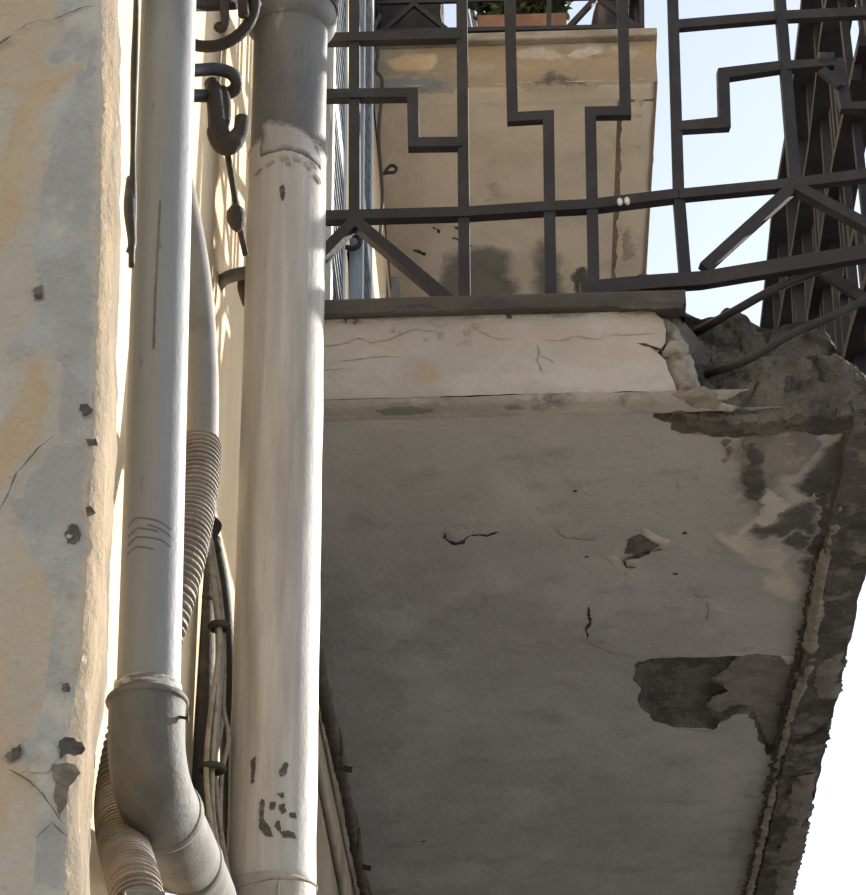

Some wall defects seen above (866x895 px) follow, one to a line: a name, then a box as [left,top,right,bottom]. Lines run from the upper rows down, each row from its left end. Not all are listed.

leakage [437,244,459,296]
leakage [470,235,545,295]
leakage [556,243,588,293]
crack [323,329,432,370]
crack [536,333,665,374]
spalling [653,308,866,475]
crack [419,519,500,546]
peeling [622,527,671,568]
leakage [717,433,843,596]
crack [585,607,632,656]
spalling [633,488,848,895]